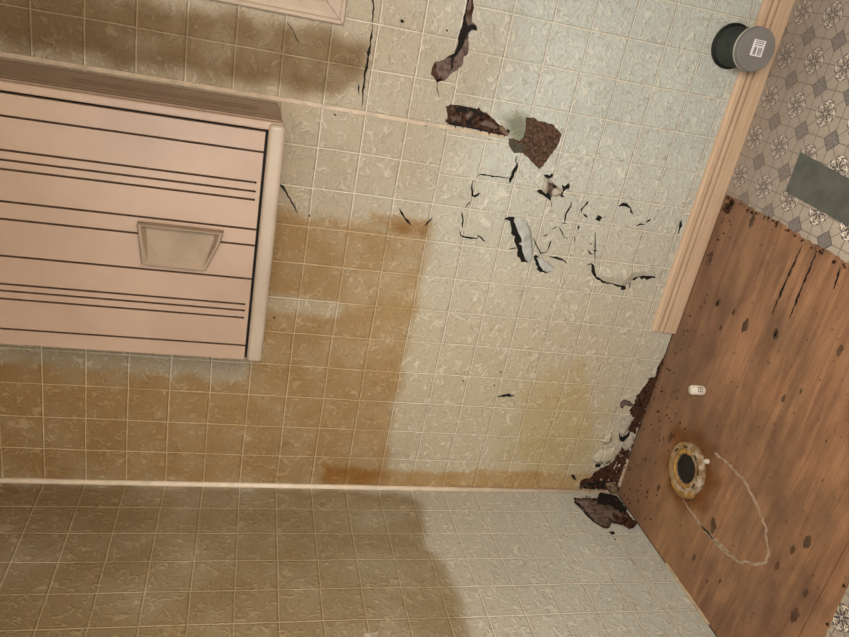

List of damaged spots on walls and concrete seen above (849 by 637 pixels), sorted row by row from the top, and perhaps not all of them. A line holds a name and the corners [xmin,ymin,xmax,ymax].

crack [358,0,374,107]
spalling [445,104,570,207]
peeling [505,217,554,273]
peeling [591,416,634,467]
spalling [571,475,627,514]